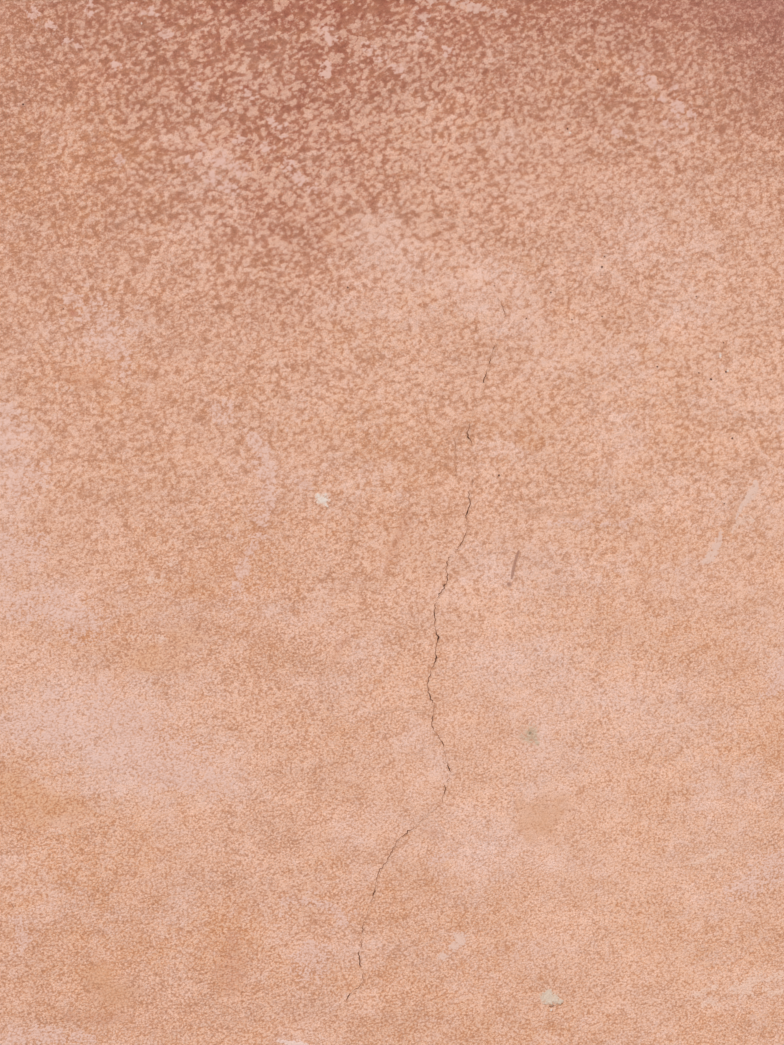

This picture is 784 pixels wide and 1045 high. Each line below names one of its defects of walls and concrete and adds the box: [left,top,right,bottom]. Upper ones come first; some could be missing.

crack [343,298,507,1005]